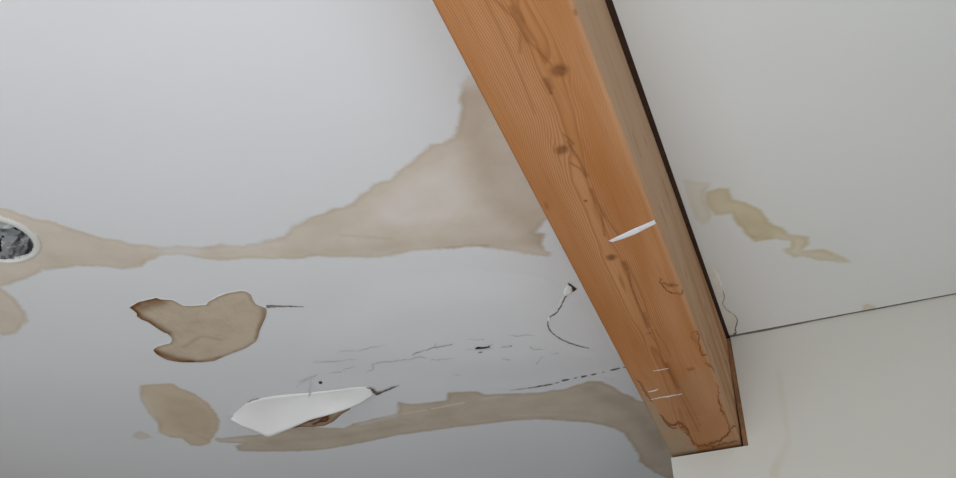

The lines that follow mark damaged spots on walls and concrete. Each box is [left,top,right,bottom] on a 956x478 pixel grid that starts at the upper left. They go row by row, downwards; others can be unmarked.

damp [0,63,564,342]
damp [675,171,864,270]
peeling [129,290,298,363]
crack [298,283,625,391]
peeling [231,374,397,437]
damp [129,330,739,478]